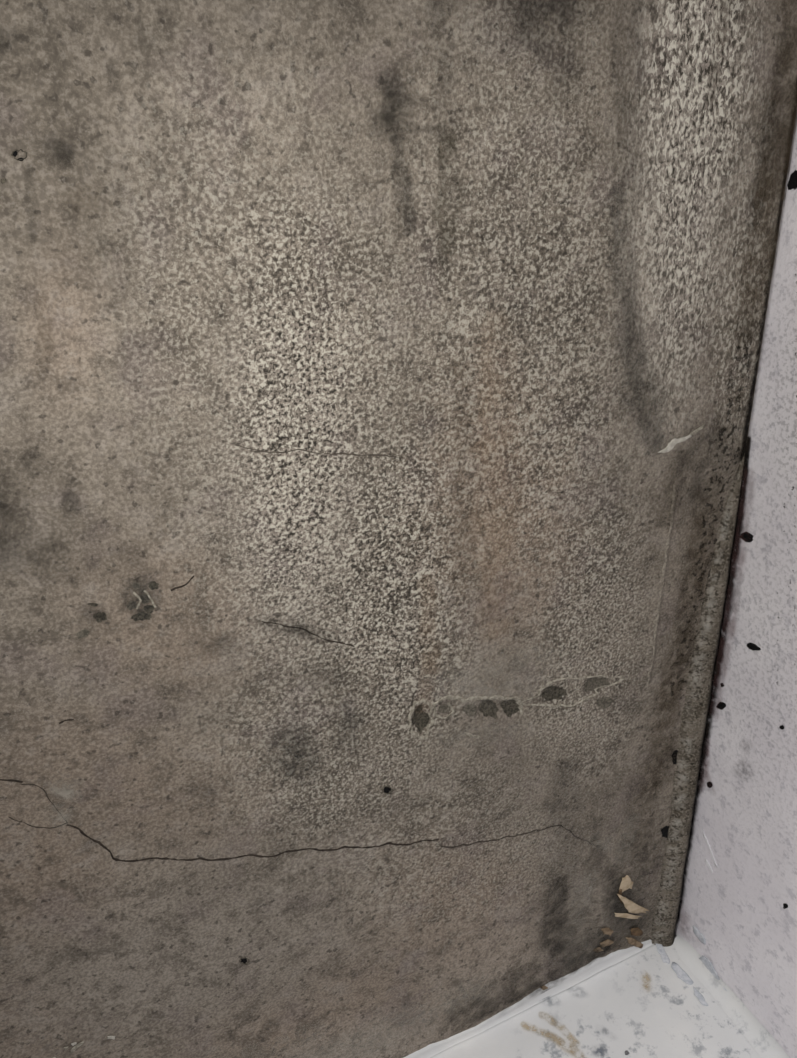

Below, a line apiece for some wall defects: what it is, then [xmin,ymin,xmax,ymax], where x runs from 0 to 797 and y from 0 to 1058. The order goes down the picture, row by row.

crack [0,779,598,862]